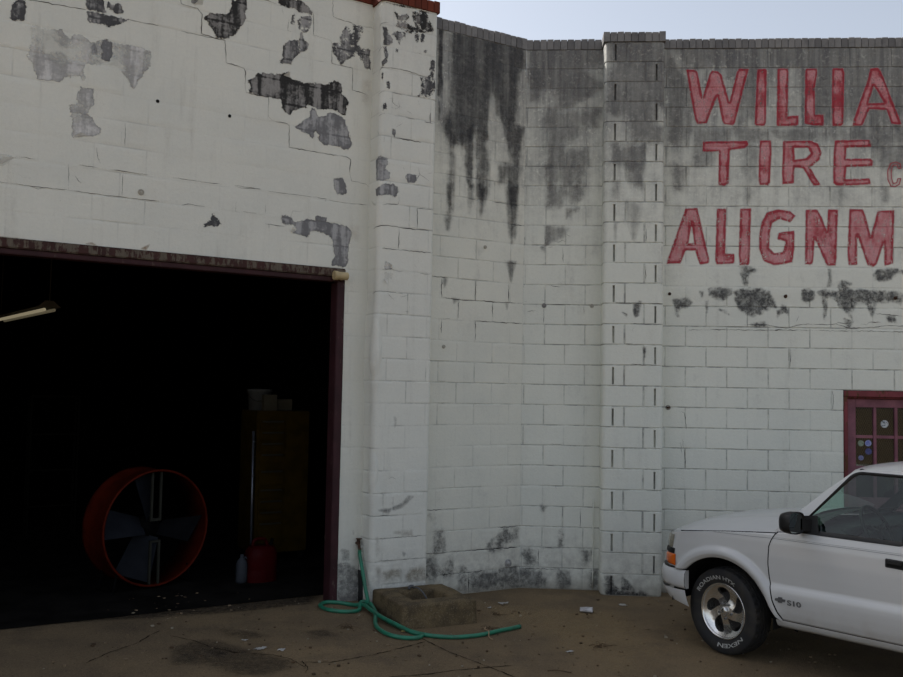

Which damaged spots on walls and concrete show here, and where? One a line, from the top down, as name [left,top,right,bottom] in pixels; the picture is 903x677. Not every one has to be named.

peeling [85,0,129,27]
peeling [191,0,247,39]
peeling [26,29,150,89]
peeling [248,0,352,150]
peeling [332,2,436,98]
peeling [69,87,101,138]
damp [438,29,524,235]
peeling [280,215,352,267]